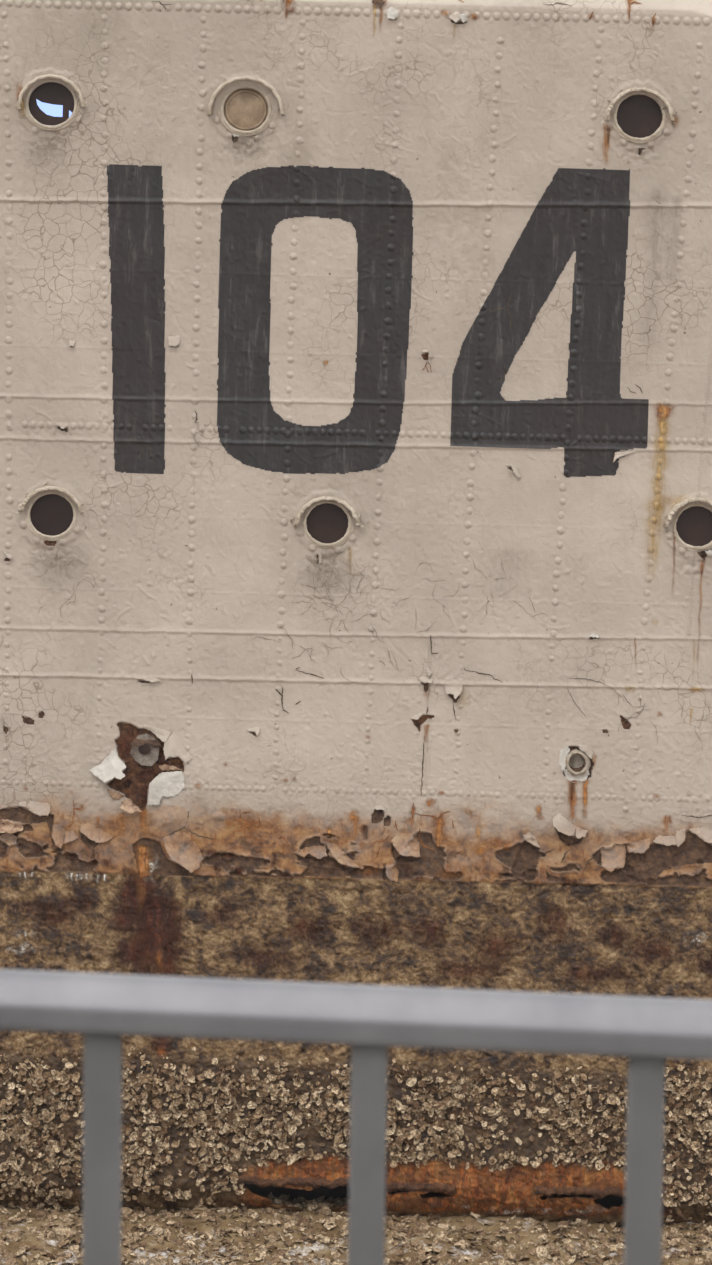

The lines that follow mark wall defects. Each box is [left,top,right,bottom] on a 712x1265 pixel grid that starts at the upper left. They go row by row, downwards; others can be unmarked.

crack [628,0,656,25]
rust [652,403,671,548]
peeling [89,723,192,814]
rust [568,780,589,818]
peeling [0,801,113,855]
rust [112,754,181,976]
peeling [133,833,203,876]
peeling [293,841,359,878]
peeling [372,805,421,882]
peeling [600,827,712,884]
rust [237,1156,349,1208]
rust [385,1161,625,1217]